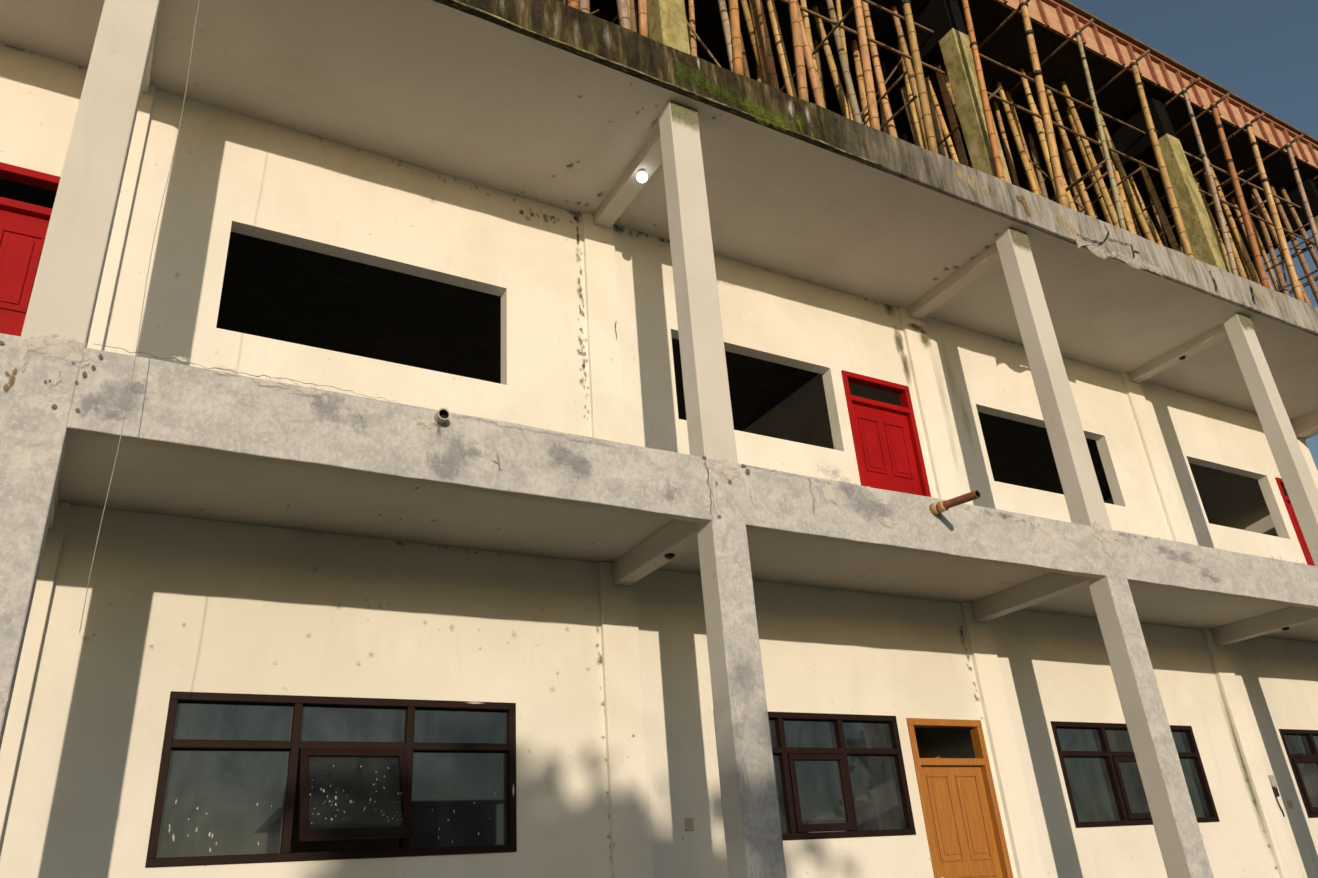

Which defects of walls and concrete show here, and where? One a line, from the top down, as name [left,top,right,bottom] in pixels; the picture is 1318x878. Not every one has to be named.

crack [1077,225,1140,258]
leakage [516,194,601,388]
spalling [3,368,17,391]
crack [96,344,399,403]